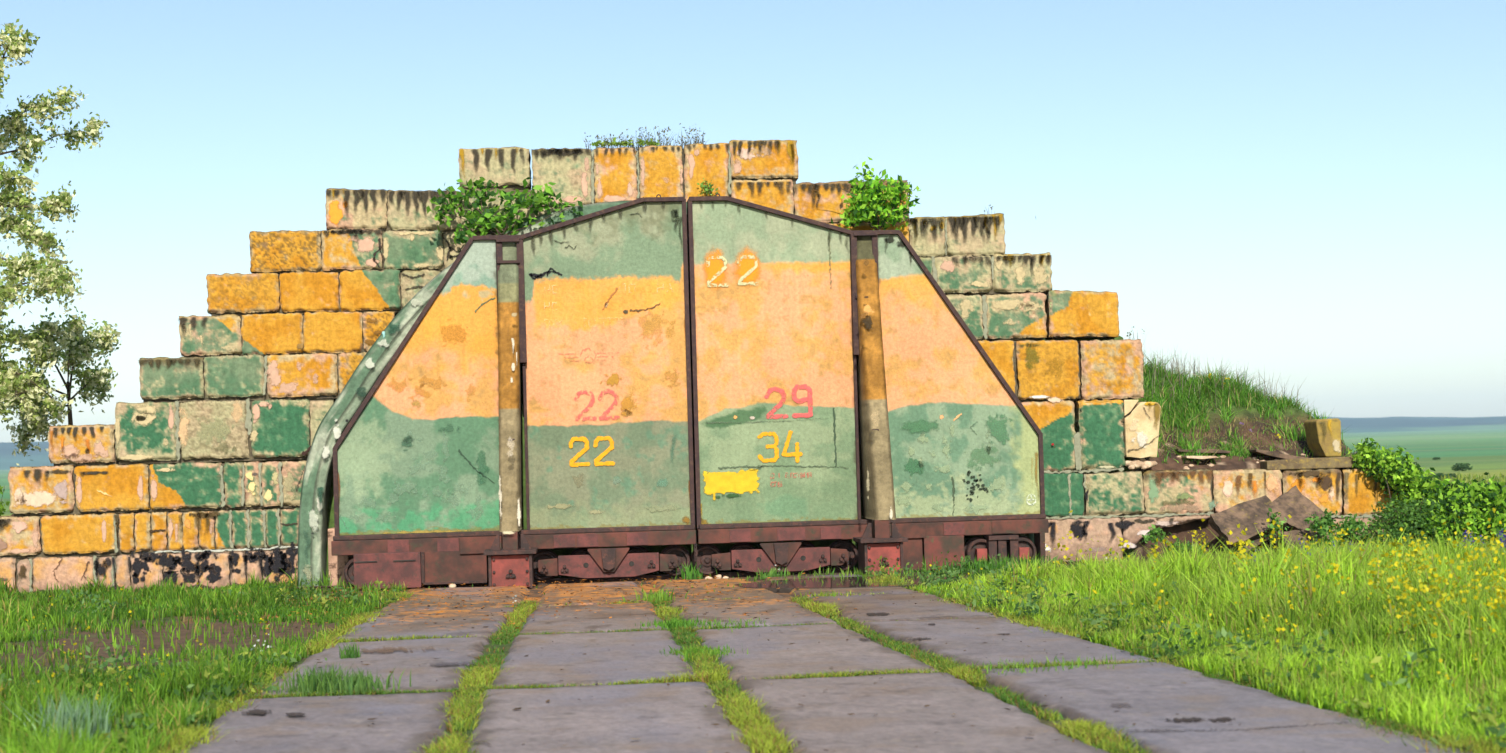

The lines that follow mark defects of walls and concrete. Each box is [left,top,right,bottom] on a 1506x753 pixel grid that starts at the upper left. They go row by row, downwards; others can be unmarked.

damp [459,140,795,170]
damp [323,189,455,237]
damp [736,181,904,211]
damp [885,214,1003,263]
damp [952,254,1051,269]
damp [94,531,310,590]